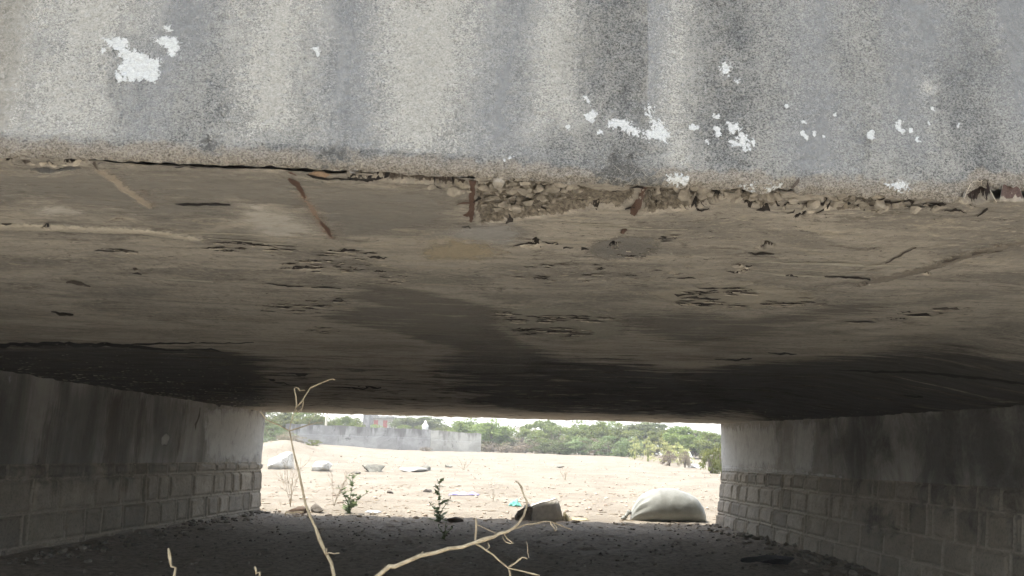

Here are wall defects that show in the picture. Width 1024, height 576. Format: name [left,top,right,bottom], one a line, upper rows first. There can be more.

peeling [100,25,182,84]
peeling [582,94,671,147]
peeling [689,113,756,152]
spalling [348,170,941,229]
spalling [960,180,1023,217]
water stain [321,287,544,374]
water stain [618,304,888,346]